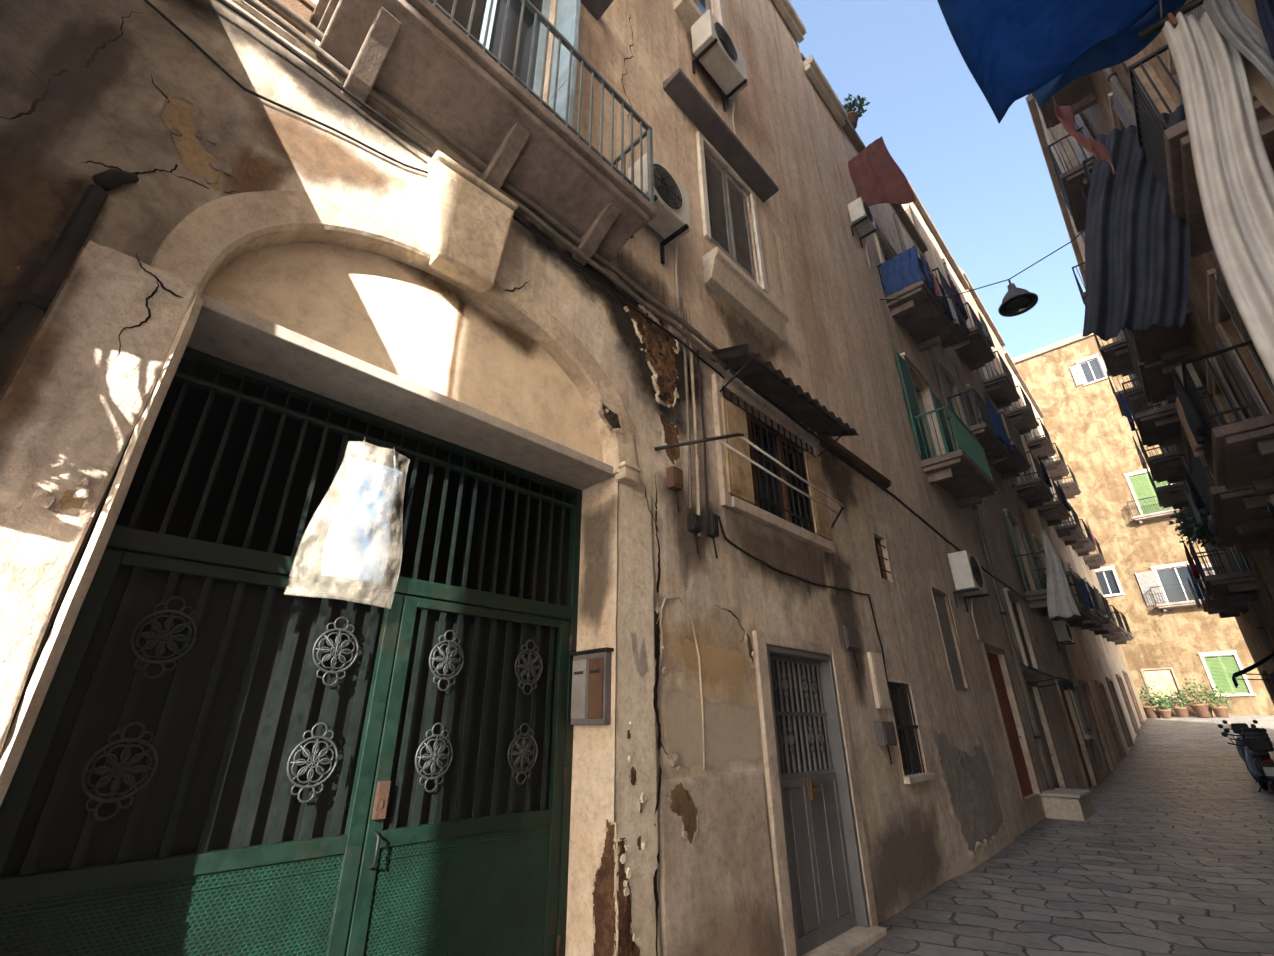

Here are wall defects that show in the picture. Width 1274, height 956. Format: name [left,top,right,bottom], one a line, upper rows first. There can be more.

crack [0,66,36,120]
water stain [0,23,125,305]
crack [112,252,184,360]
spalling [624,304,682,467]
crack [643,473,670,956]
peeling [627,756,647,814]
peeling [667,752,699,847]
spalling [590,817,646,956]